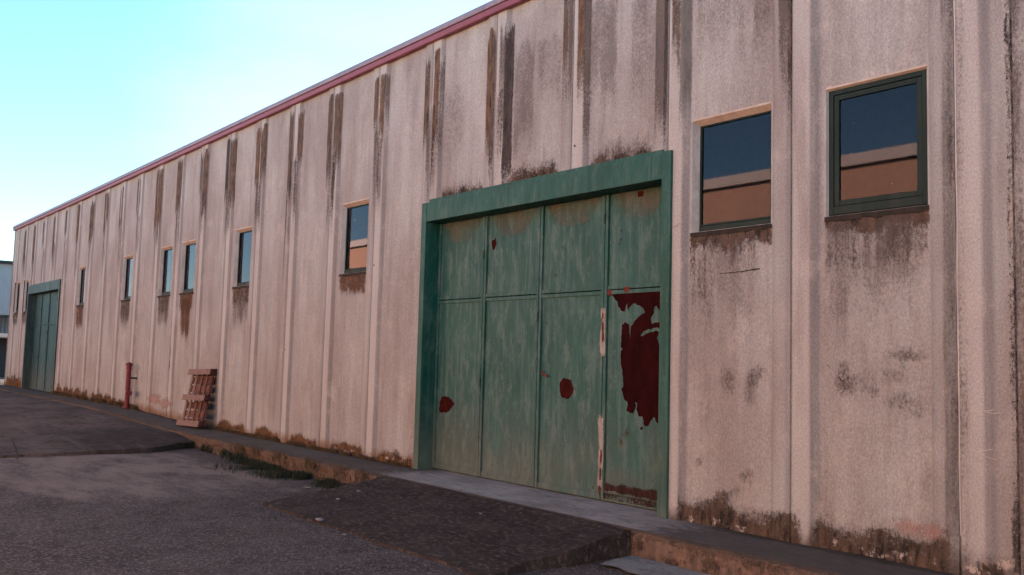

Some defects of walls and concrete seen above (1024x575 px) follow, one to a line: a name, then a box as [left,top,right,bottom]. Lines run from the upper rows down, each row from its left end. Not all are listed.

damp [326,92,343,219]
damp [372,74,390,201]
damp [423,48,445,190]
damp [485,23,558,183]
damp [689,228,772,296]
damp [825,210,930,272]
peeling [439,396,454,413]
peeling [559,378,574,399]
peeling [600,286,660,430]